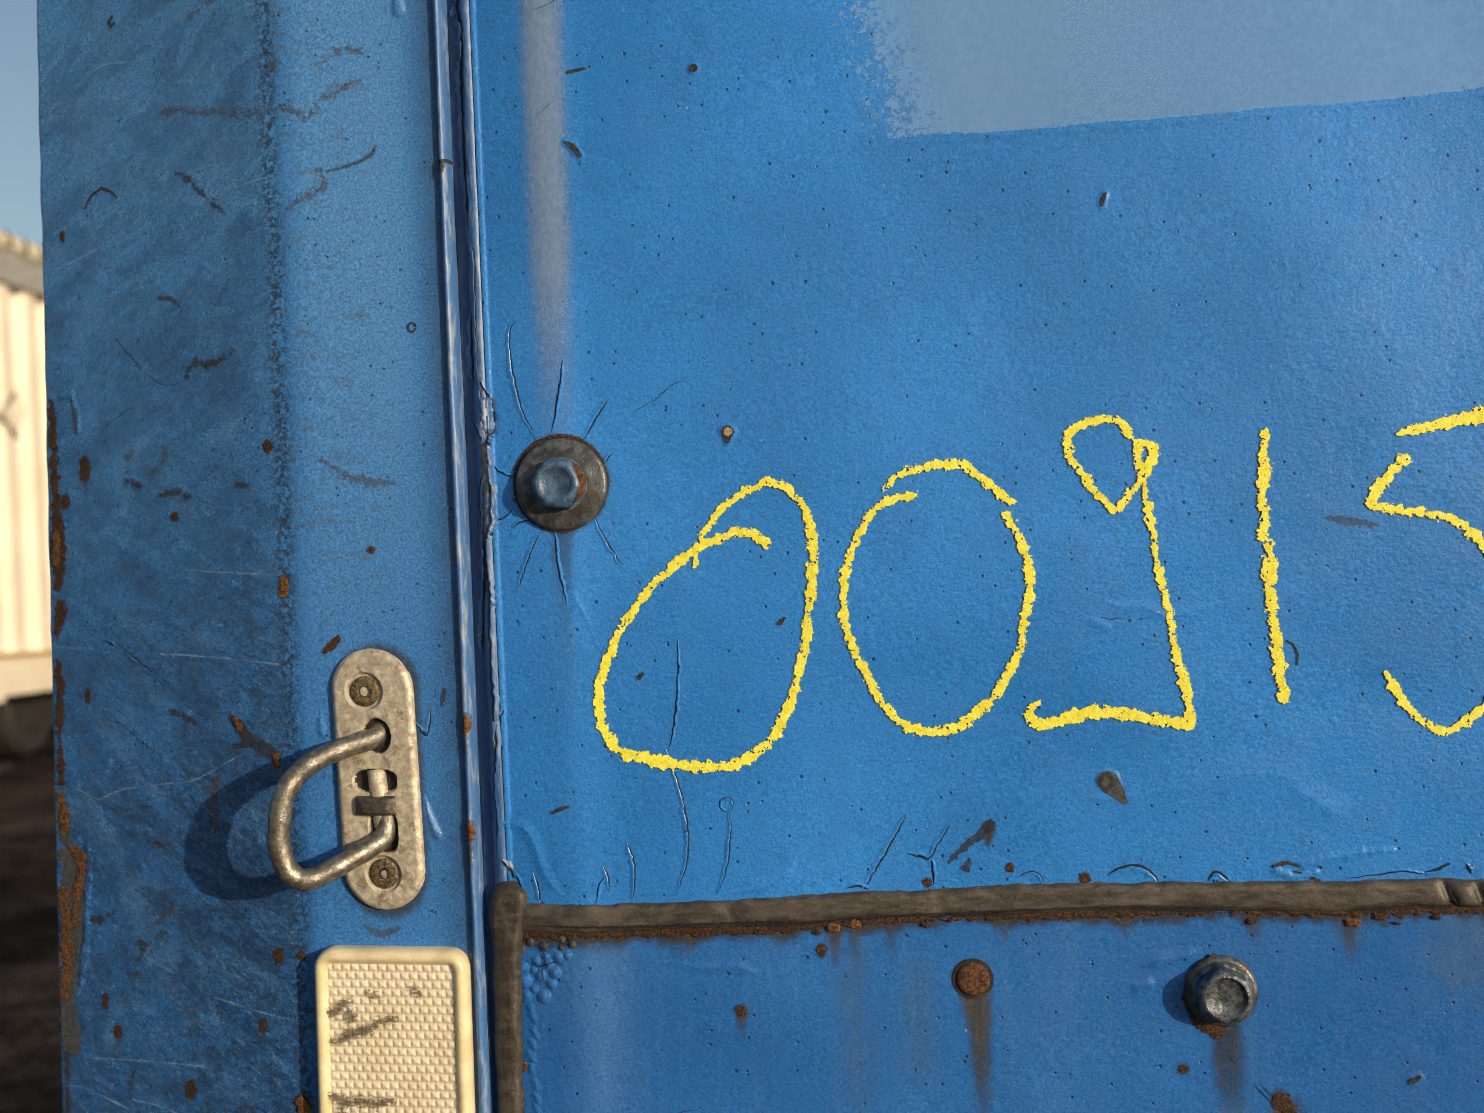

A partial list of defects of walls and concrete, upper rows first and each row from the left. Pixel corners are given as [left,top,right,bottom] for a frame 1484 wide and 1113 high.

rust [78,457,92,481]
rust [47,399,70,786]
rust [522,902,1484,958]
rust [964,991,990,1079]
rust [295,1095,313,1113]
rust [1254,1084,1298,1113]